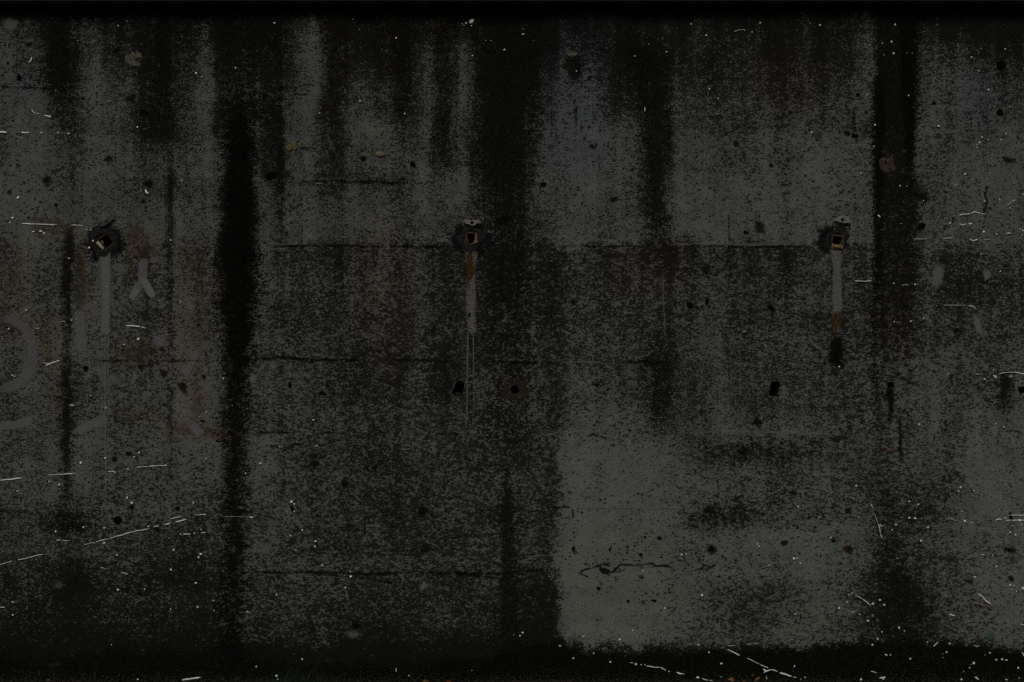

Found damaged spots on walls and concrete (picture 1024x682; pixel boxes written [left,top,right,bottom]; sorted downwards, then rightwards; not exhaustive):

water stain [208,10,303,661]
water stain [431,12,547,452]
water stain [627,37,671,243]
water stain [869,14,922,462]
crack [255,561,716,583]
water stain [492,469,521,658]